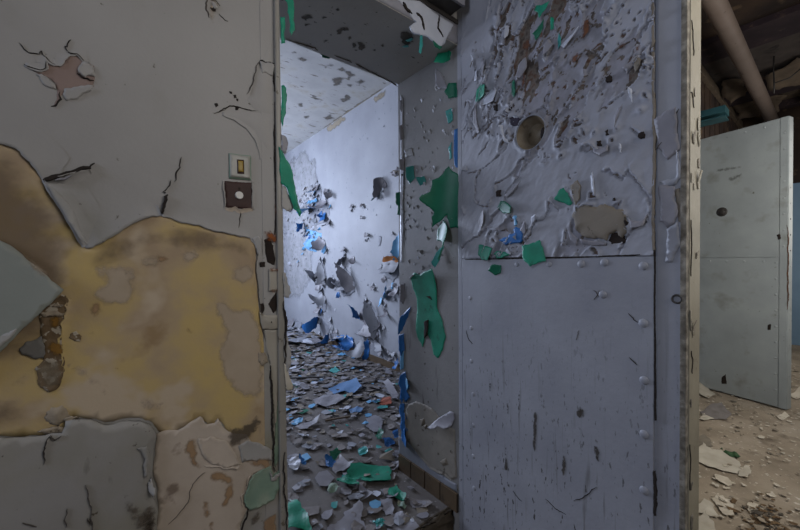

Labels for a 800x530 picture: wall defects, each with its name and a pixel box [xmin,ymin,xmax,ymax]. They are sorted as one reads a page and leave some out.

peeling [21,40,95,107]
crack [214,60,275,114]
crack [43,163,95,185]
crack [161,157,182,214]
peeling [279,0,681,493]
peeling [0,111,306,530]
crack [43,435,61,463]
crack [85,485,93,530]